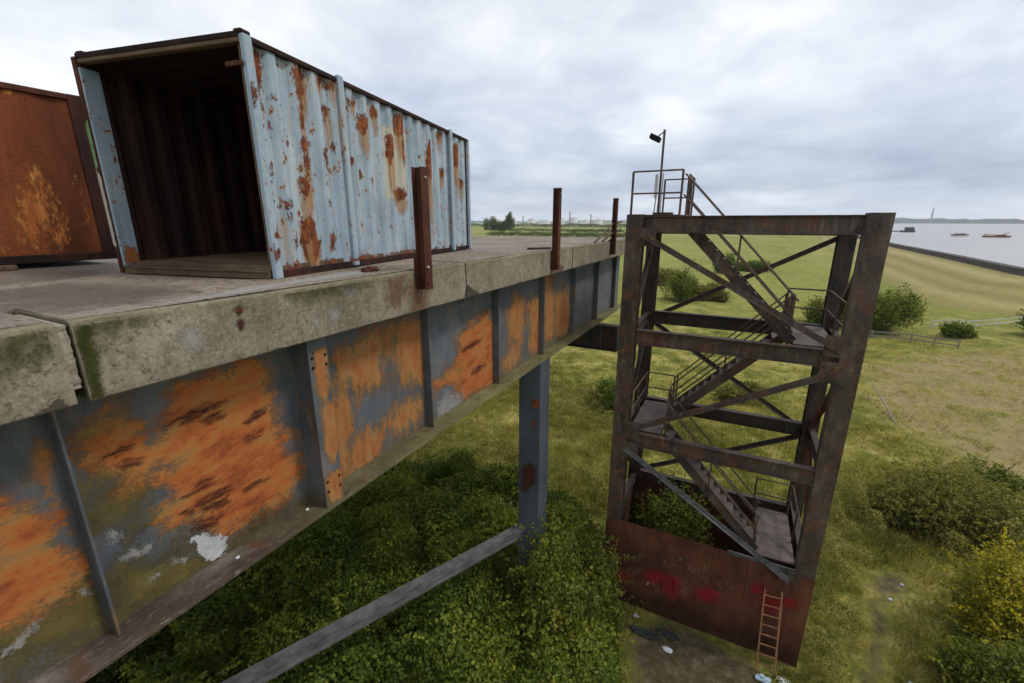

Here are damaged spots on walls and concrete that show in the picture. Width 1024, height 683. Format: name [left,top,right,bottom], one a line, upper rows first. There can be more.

corrosion [251,48,277,129]
corrosion [269,64,416,269]
corrosion [0,357,307,631]
leakage [0,459,311,683]
corrosion [313,267,570,504]
corrosion [609,586,793,661]